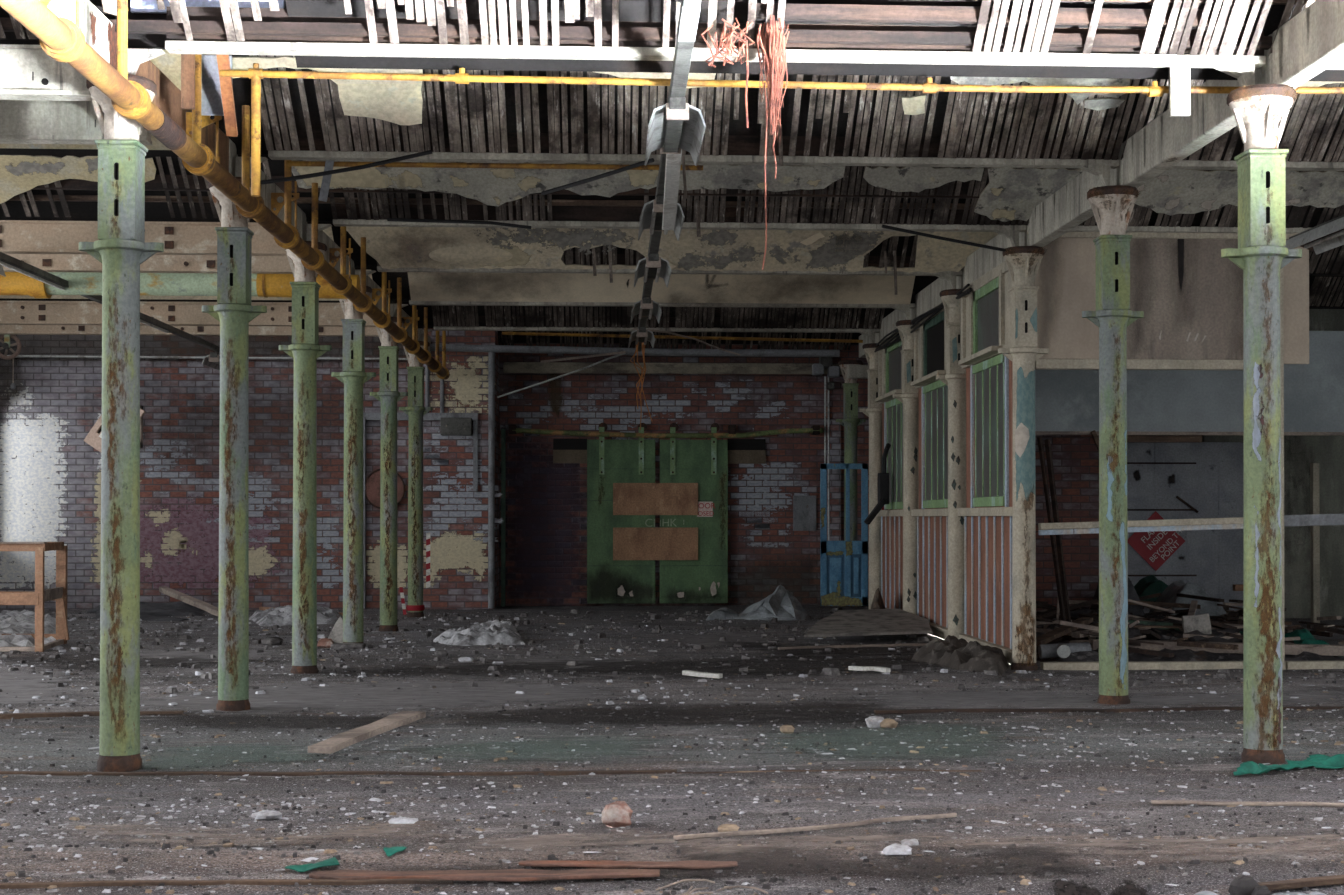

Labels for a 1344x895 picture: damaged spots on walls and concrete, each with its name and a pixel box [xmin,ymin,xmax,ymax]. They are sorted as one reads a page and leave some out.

flaking render [0,155,98,204]
flaking render [232,56,423,125]
flaking render [292,160,660,206]
flaking render [346,164,1084,273]
flaking render [1285,171,1344,208]
peeling [0,383,72,589]
corrosion [106,293,128,739]
corrosion [223,340,240,686]
corrosion [296,374,311,652]
corrosion [346,399,359,634]
corrosion [1106,335,1121,490]
corrosion [1255,225,1281,751]